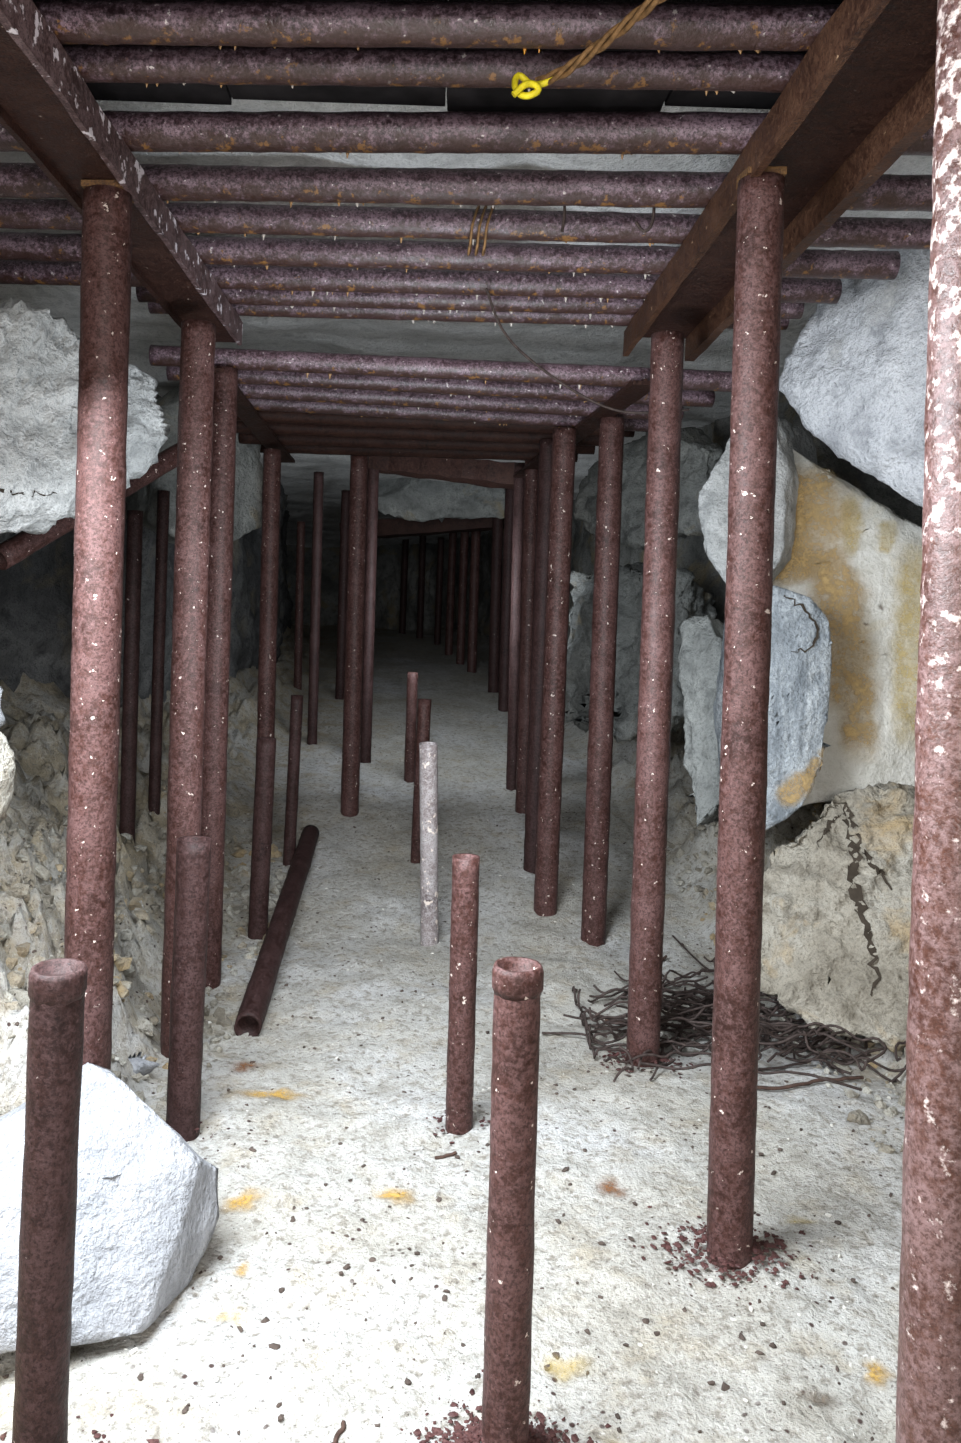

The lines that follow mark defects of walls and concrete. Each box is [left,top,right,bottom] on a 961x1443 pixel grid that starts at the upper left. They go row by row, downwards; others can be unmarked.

rust [624,1206,820,1307]
rust [400,1388,484,1443]
rust [528,1400,612,1443]